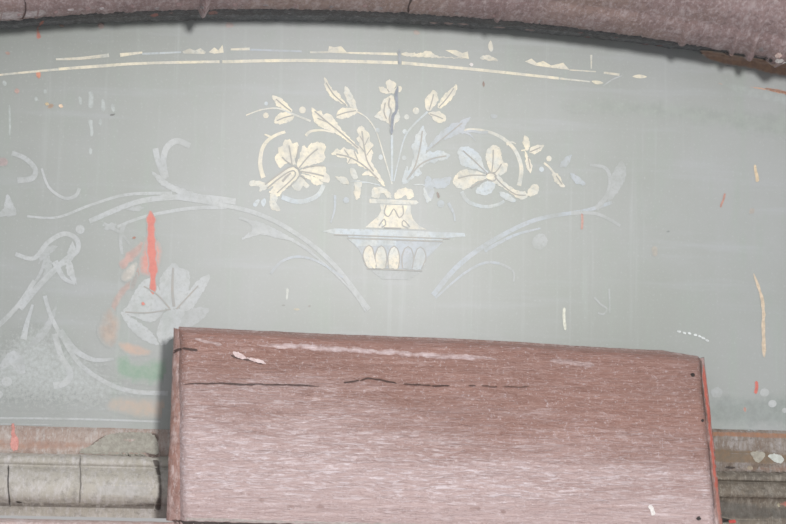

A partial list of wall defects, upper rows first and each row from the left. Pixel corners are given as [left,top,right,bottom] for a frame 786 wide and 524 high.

spalling [706,47,786,64]
crack [183,380,319,388]
crack [344,377,529,388]
peeling [698,357,736,524]
crack [5,465,13,507]